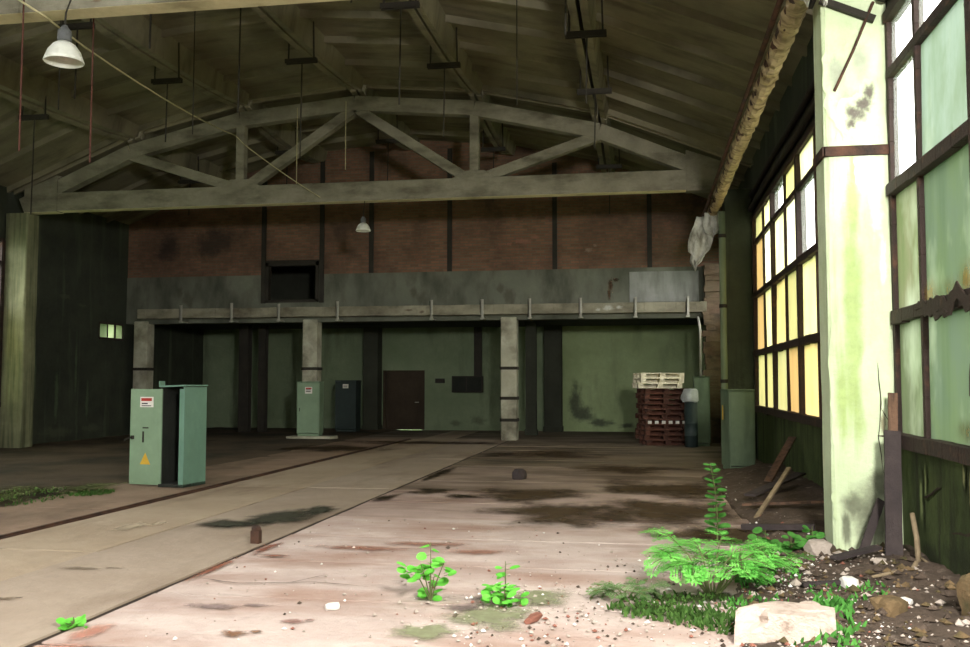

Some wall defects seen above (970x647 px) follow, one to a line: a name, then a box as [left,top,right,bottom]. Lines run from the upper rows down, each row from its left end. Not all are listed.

water stain [197,506,334,527]